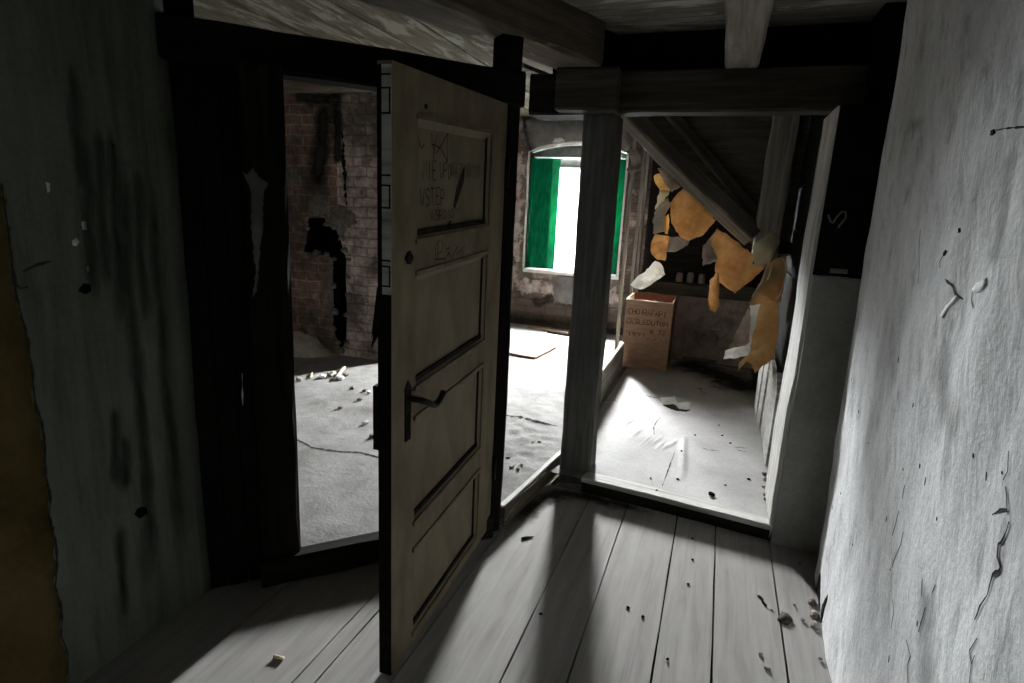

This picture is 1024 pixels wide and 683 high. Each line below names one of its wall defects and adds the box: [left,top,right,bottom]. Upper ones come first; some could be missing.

peeling [242,168,269,296]
flaking render [940,278,987,318]
flaking render [0,183,69,683]
crack [969,451,1009,683]